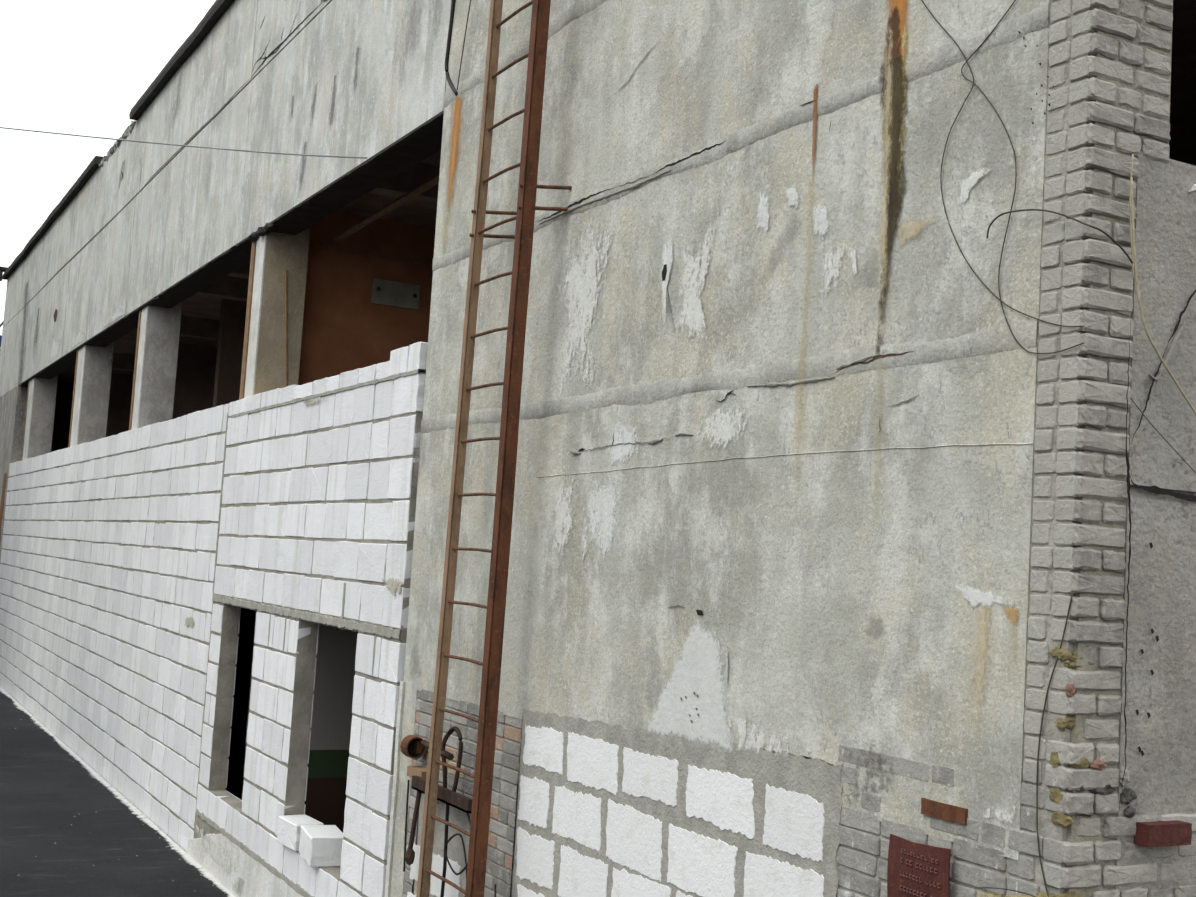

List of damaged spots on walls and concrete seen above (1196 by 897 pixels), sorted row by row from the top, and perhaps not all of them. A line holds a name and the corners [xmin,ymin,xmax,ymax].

rust [448,98,461,208]
crack [535,142,723,224]
flaking render [660,225,715,339]
flaking render [757,193,769,232]
flaking render [786,187,799,207]
flaking render [814,205,857,294]
rust [876,0,908,358]
crack [835,350,916,373]
crack [569,432,692,455]
crack [878,395,918,435]